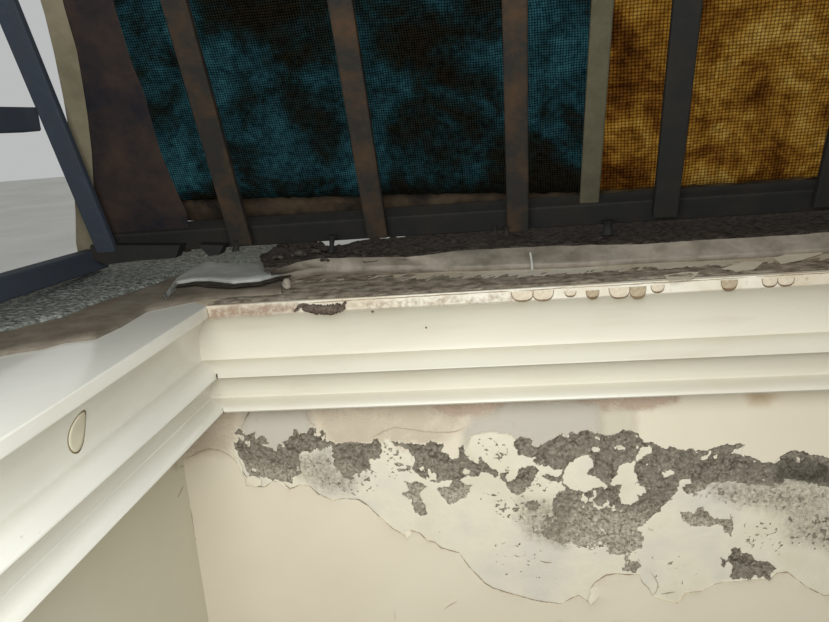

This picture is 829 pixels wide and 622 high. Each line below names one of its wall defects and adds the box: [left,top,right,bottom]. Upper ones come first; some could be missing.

peeling [219,427,829,605]